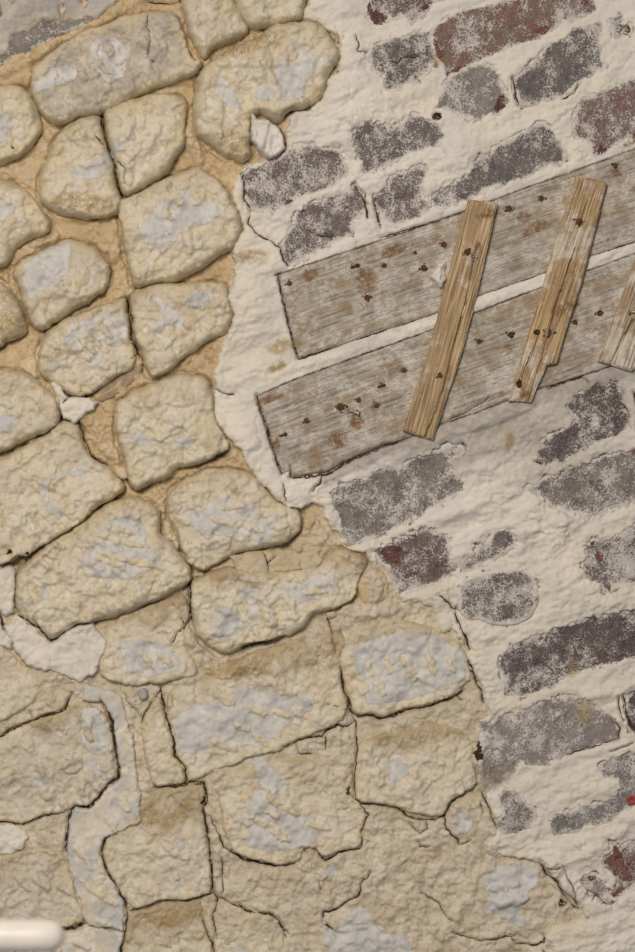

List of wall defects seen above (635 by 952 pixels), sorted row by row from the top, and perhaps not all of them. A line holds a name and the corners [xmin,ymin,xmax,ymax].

spalling [367,1,388,25]
peeling [33,66,77,94]
peeling [90,36,131,83]
peeling [214,57,286,159]
spalling [494,95,509,113]
spalling [380,545,401,563]
peeling [351,632,466,704]
crack [0,595,497,952]
peeling [483,864,540,928]
spalling [603,845,633,897]
peeling [322,906,413,952]
crack [424,893,545,952]